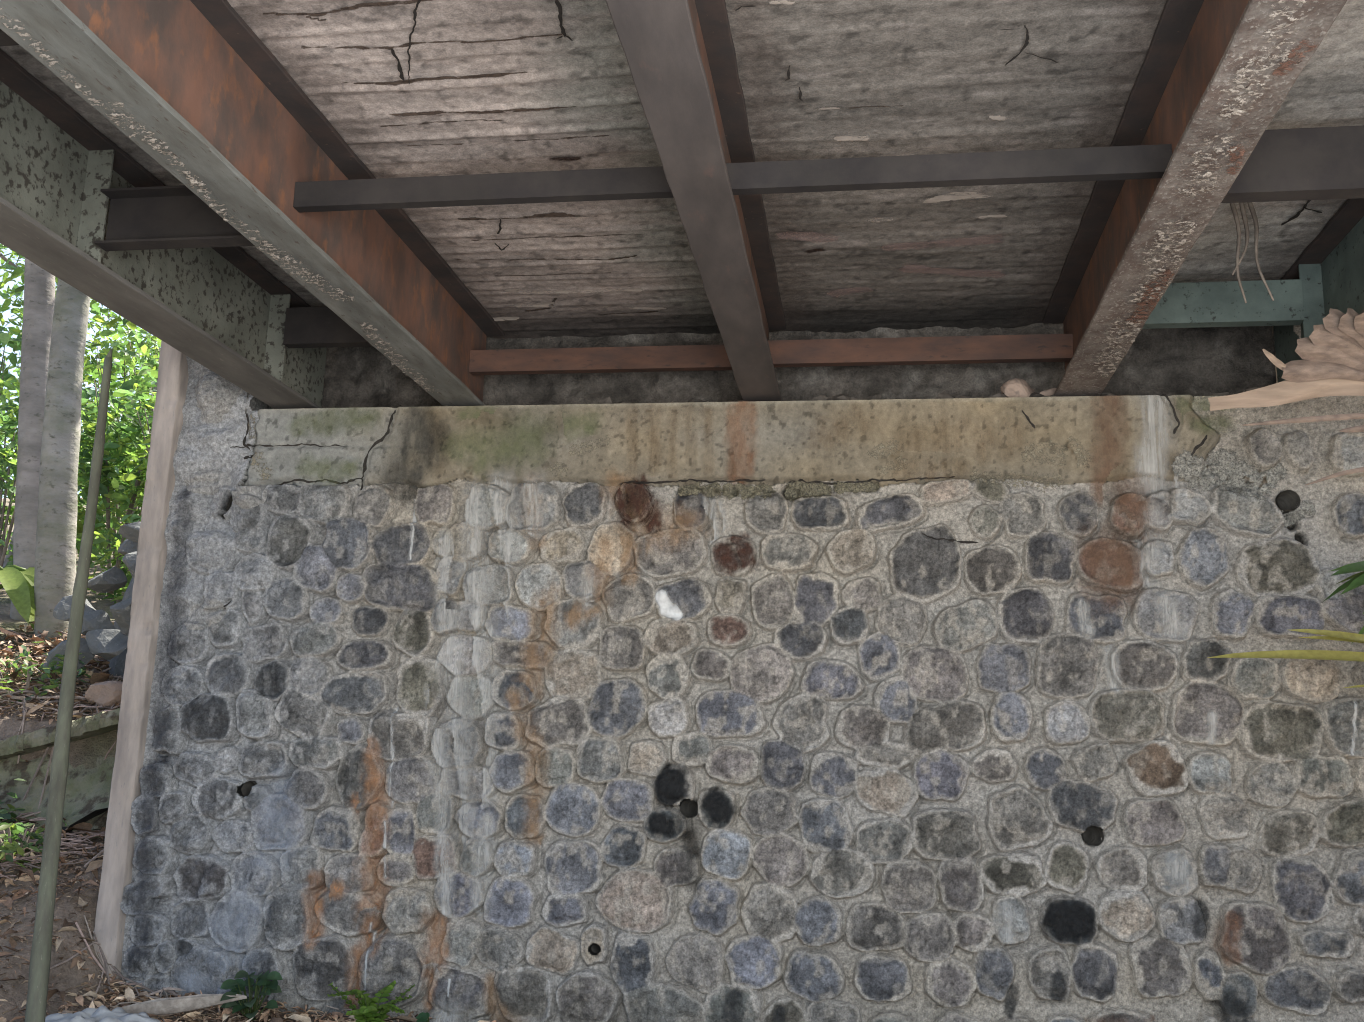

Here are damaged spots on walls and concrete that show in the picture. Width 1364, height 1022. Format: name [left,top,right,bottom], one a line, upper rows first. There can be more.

crack [391,0,421,84]
crack [555,0,573,41]
rust [1272,39,1317,77]
crack [230,410,396,490]